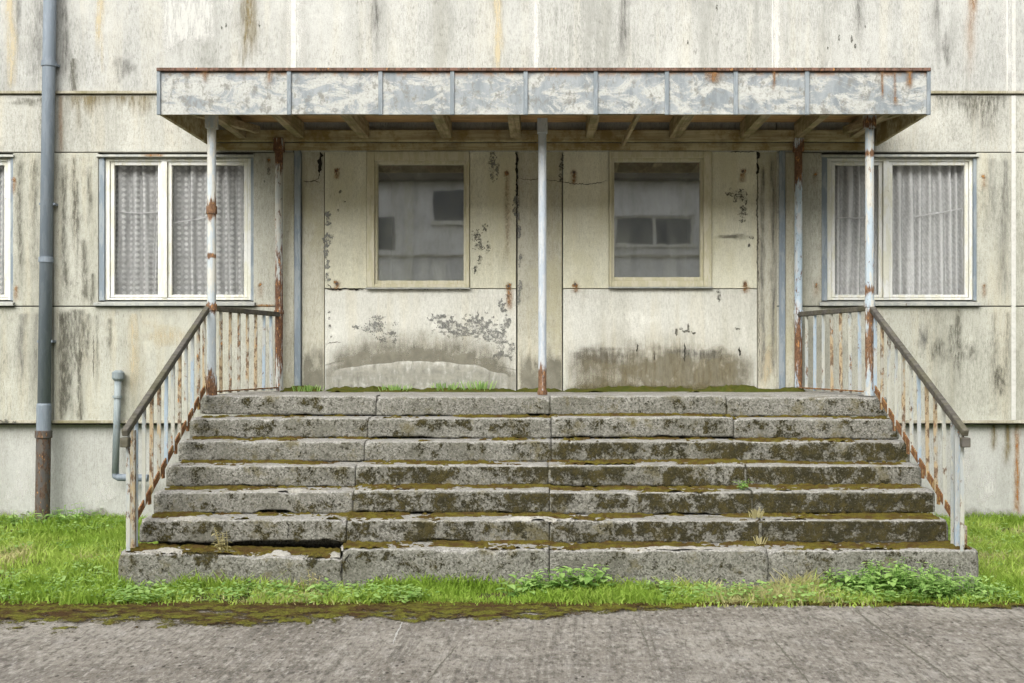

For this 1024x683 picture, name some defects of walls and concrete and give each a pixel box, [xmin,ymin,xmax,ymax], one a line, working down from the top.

crack [304,152,323,182]
spalling [512,190,522,238]
crack [515,152,606,234]
peeling [471,224,491,274]
peeling [352,315,398,344]
peeling [427,280,523,360]
water stain [59,310,111,420]
water stain [336,344,505,373]
water stain [578,349,747,390]